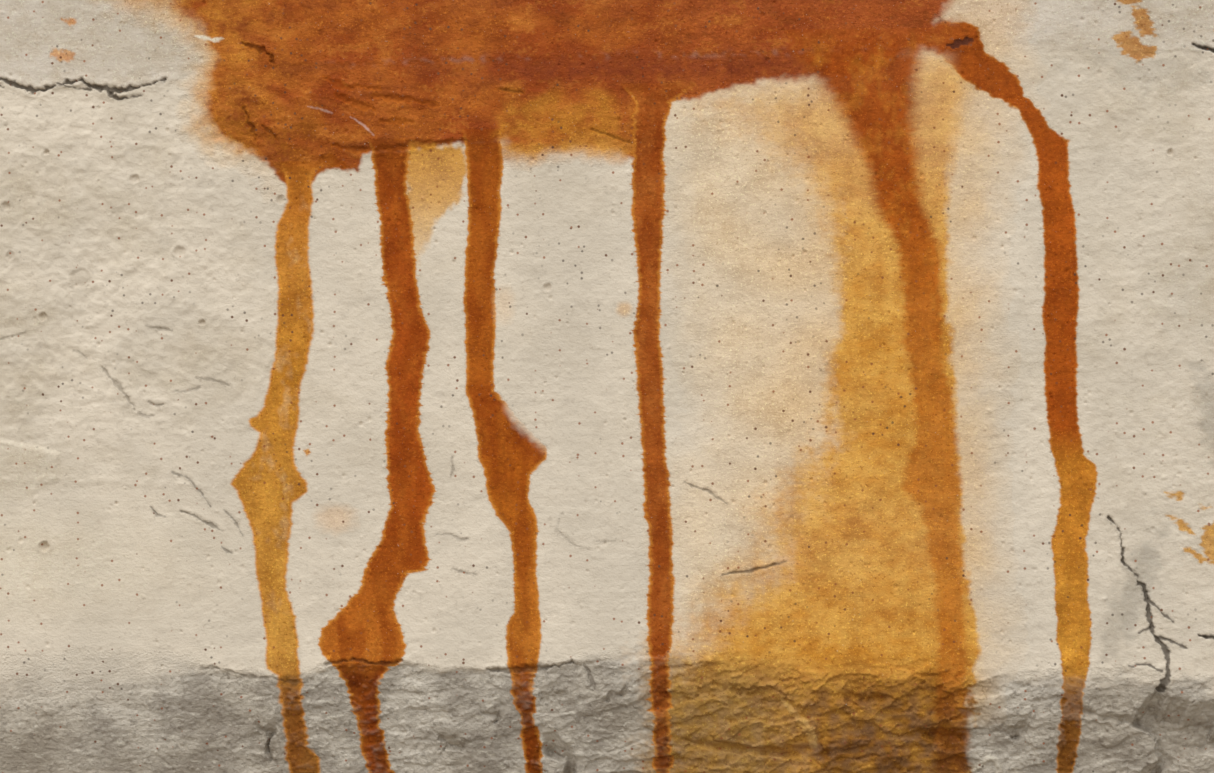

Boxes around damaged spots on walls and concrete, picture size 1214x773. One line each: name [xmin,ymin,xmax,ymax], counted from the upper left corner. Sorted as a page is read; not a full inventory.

crack [0,76,168,102]
rust [938,0,1051,114]
rust [1110,0,1159,65]
rust [78,0,1033,773]
rust [923,20,1100,773]
rust [1163,489,1214,566]
crack [1106,514,1214,694]
spalling [0,645,288,773]
spalling [302,644,645,773]
spalling [970,661,1064,773]
spalling [1074,660,1214,773]